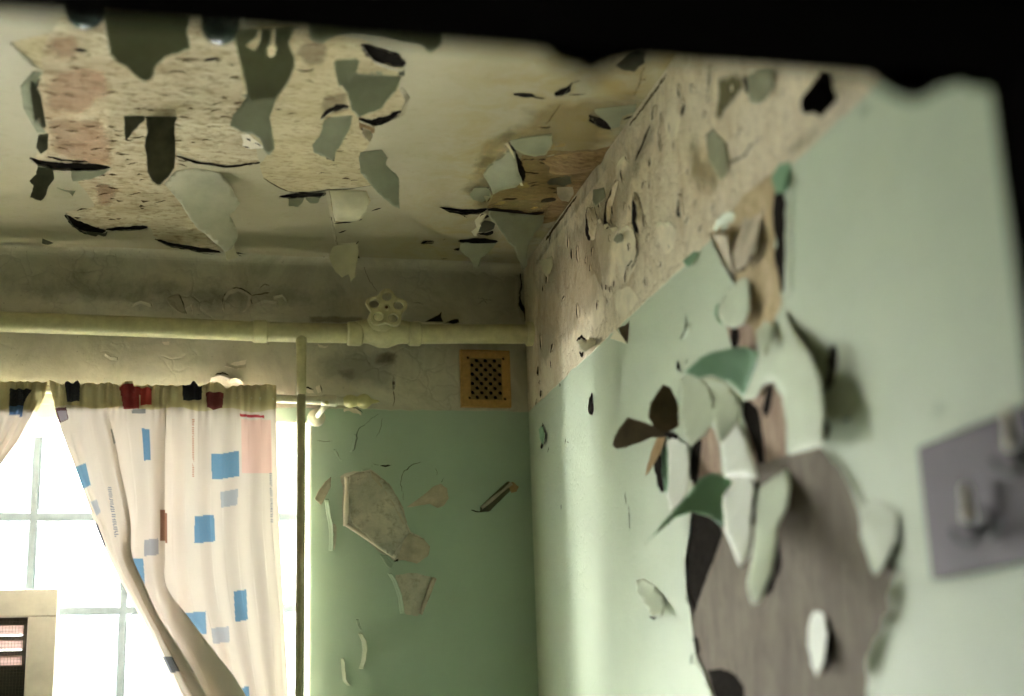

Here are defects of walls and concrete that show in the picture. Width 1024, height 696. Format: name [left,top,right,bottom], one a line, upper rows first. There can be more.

peeling [535,42,652,84]
flaking render [9,17,410,260]
peeling [588,104,637,132]
peeling [664,106,680,141]
peeling [443,135,640,357]
flaking render [613,161,906,696]
peeling [472,481,519,512]
peeling [315,465,436,616]
peeling [356,619,368,669]
peeling [341,658,351,686]